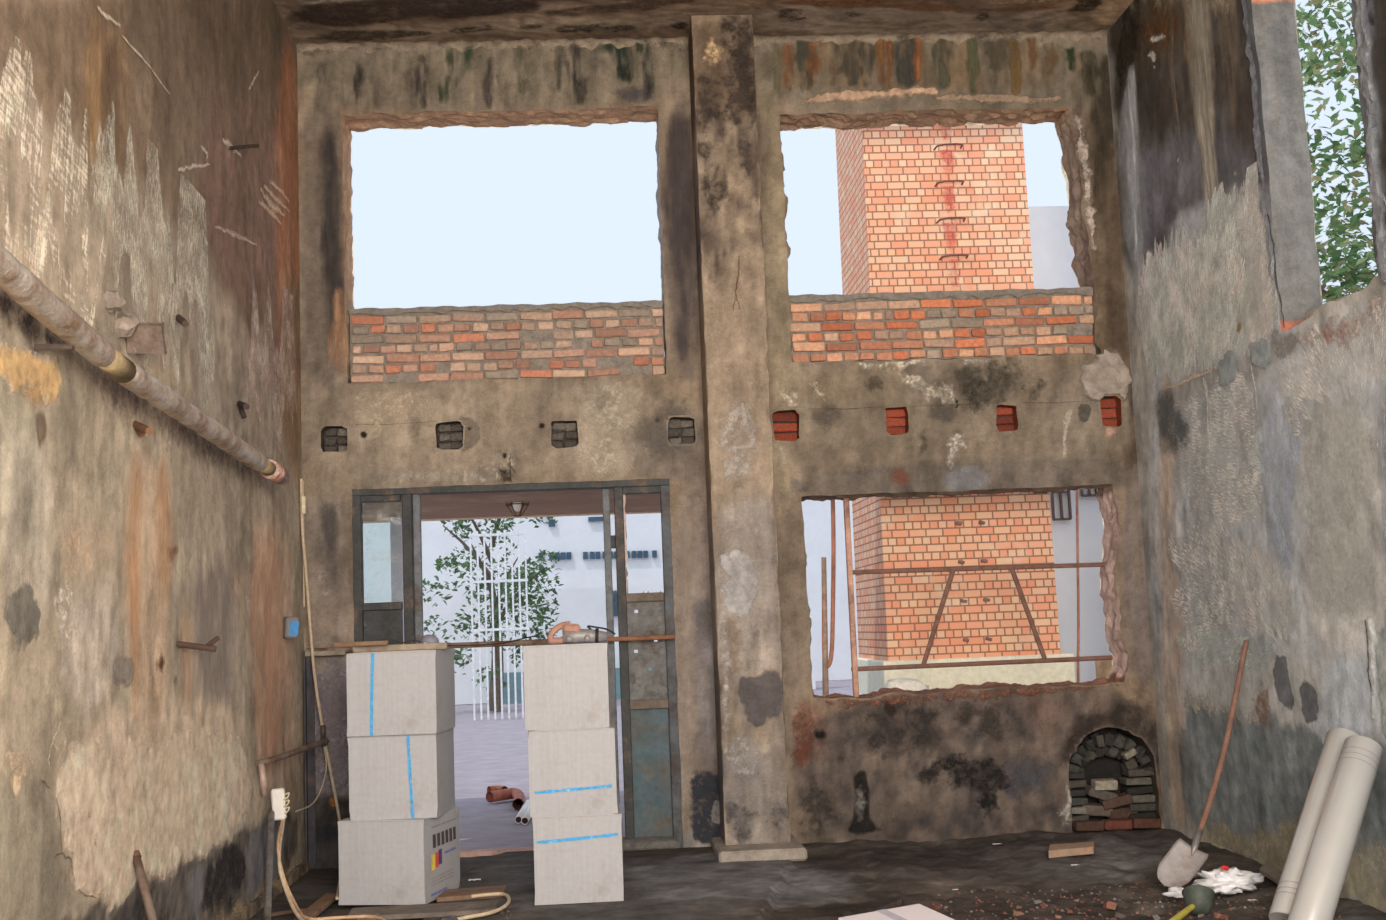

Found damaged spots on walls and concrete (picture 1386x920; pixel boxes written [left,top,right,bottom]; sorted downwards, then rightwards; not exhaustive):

damp [704,41,720,62]
damp [796,41,812,85]
damp [895,38,1006,93]
flaking render [720,549,757,617]
flaking render [8,722,250,909]
damp [854,790,865,811]